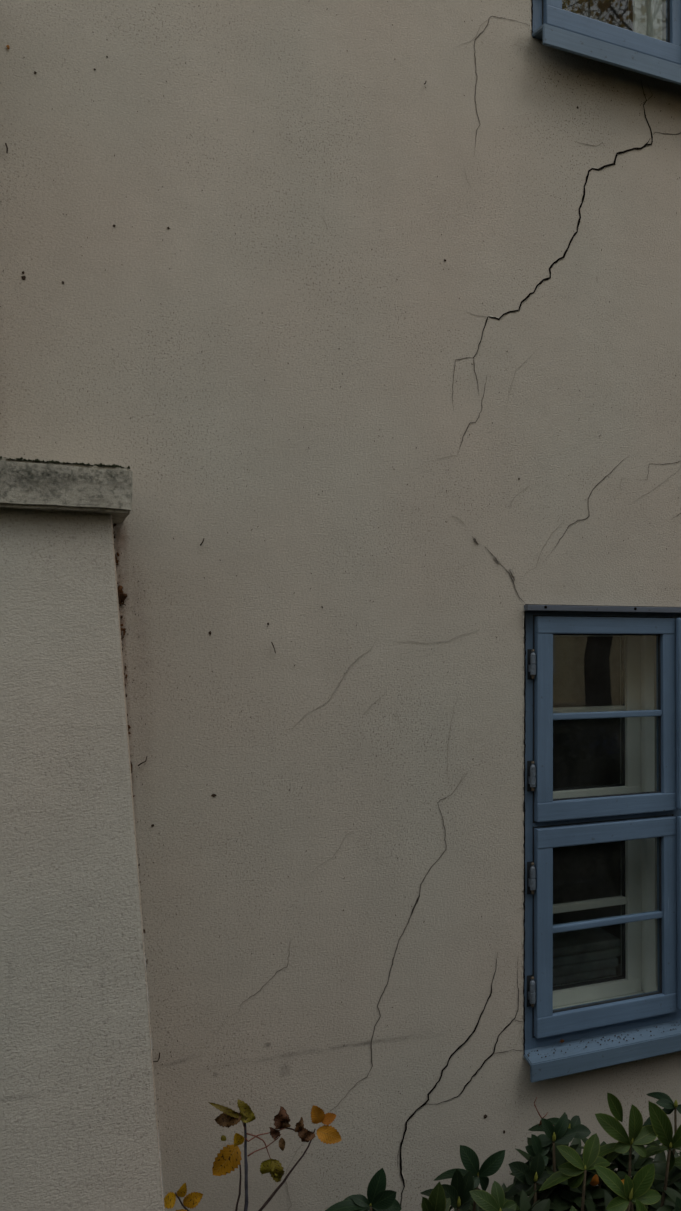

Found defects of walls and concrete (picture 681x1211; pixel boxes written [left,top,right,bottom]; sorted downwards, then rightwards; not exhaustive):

crack [455,16,525,187]
crack [440,82,681,459]
crack [451,459,681,603]
crack [328,687,469,1113]
crack [397,952,524,1207]